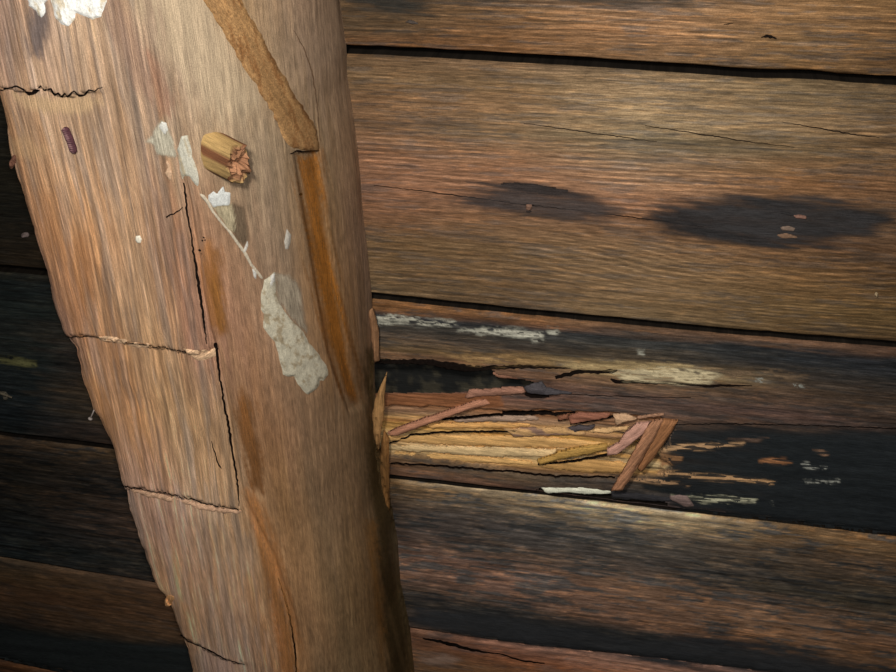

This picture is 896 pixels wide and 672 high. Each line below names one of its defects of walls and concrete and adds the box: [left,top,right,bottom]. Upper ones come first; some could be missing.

peeling [28,0,107,26]
crack [0,85,102,98]
water stain [463,185,614,219]
water stain [651,195,889,248]
peeling [147,121,328,394]
crack [65,183,239,510]
spalling [374,358,572,398]
peeling [504,411,664,437]
peeling [542,487,694,507]
crack [278,578,297,672]